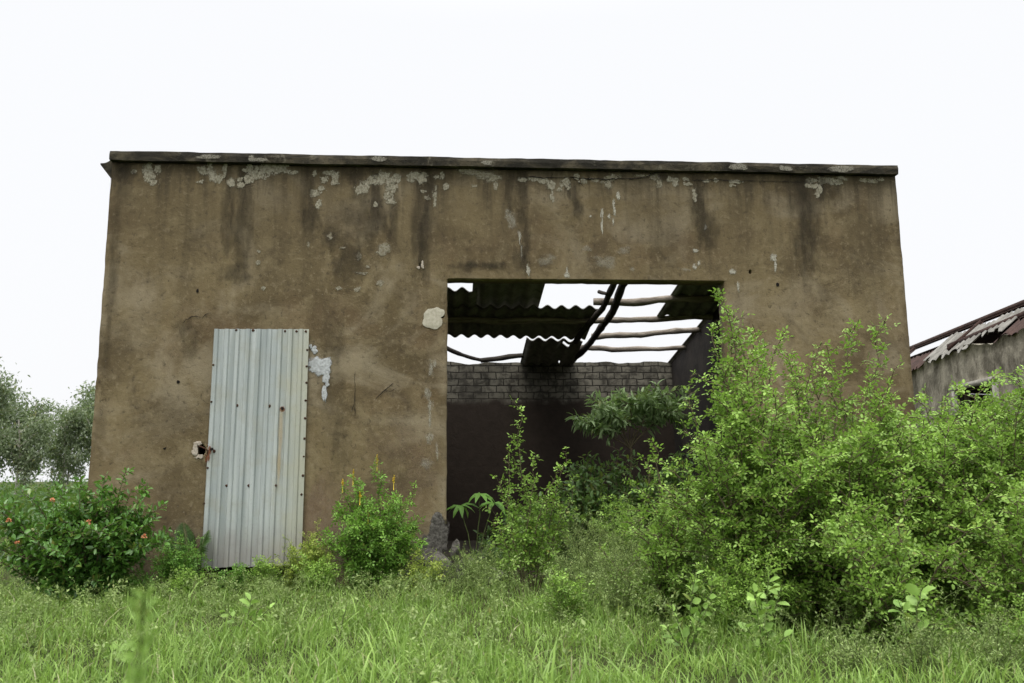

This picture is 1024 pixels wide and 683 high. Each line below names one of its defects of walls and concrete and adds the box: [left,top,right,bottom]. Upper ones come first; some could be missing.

flaking render [131,163,161,186]
flaking render [196,163,298,188]
flaking render [310,170,340,208]
flaking render [354,169,449,207]
flaking render [518,173,620,202]
flaking render [636,174,740,202]
flaking render [805,176,884,198]
water stain [590,192,620,233]
flaking render [376,243,390,256]
flaking render [191,441,203,459]